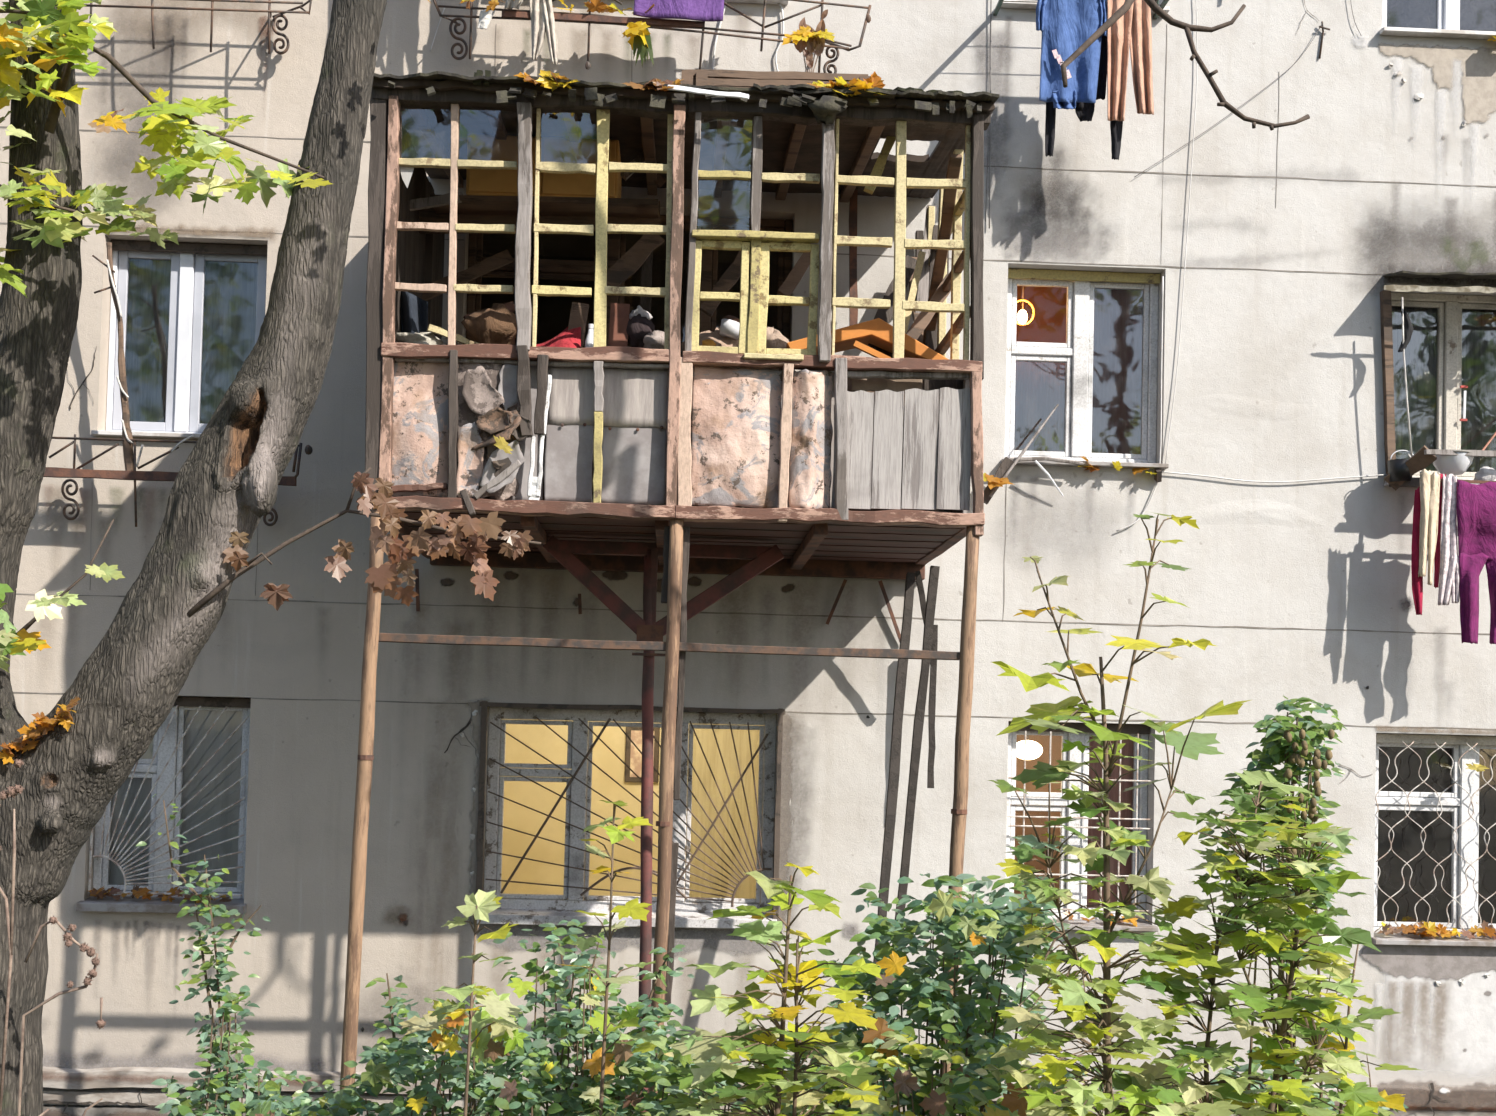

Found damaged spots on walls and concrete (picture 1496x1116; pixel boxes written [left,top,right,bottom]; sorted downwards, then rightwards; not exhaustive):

peeling [1379,43,1496,160]
leakage [1385,237,1496,285]